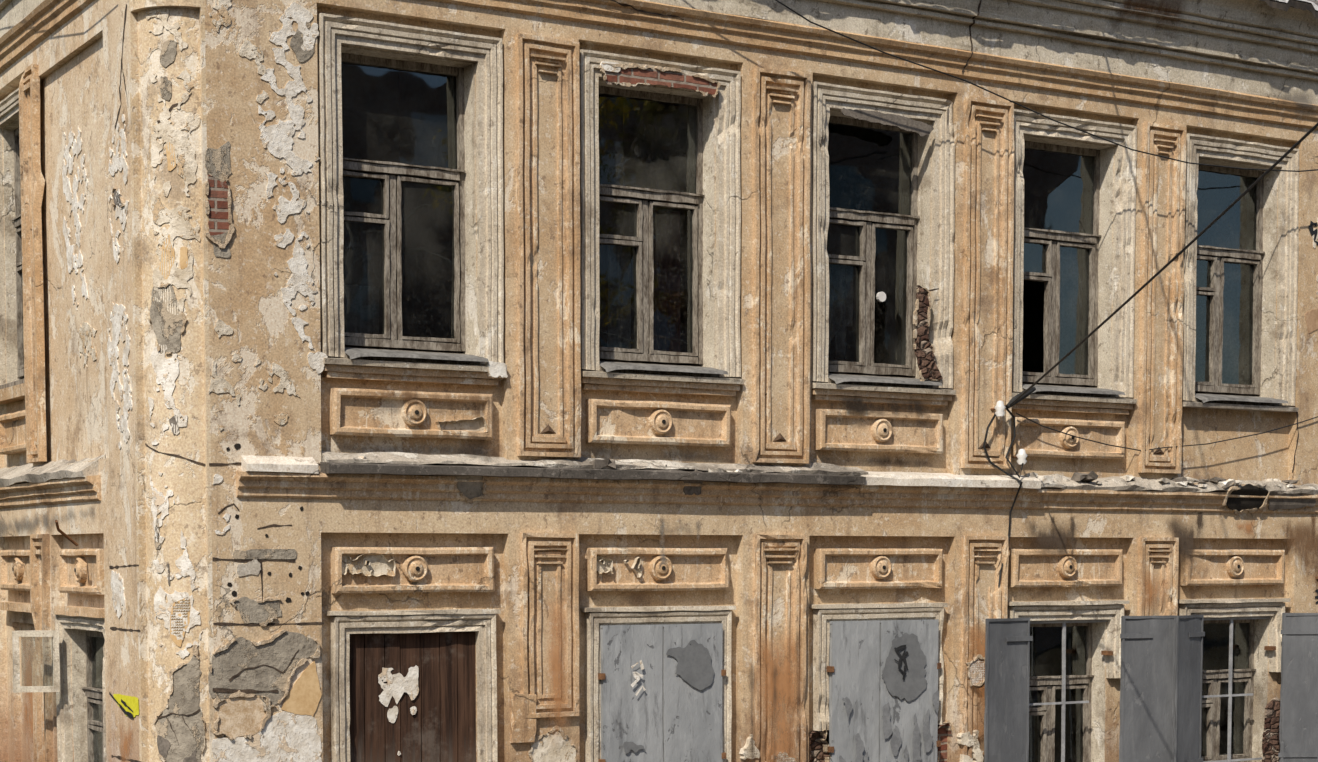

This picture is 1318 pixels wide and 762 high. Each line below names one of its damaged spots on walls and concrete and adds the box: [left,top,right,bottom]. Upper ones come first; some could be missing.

crack [962,0,982,73]
flaking render [599,61,721,98]
peeling [239,2,328,374]
peeling [62,8,235,449]
flaking render [913,285,942,381]
peeling [232,353,299,397]
peeling [338,554,396,577]
peeling [150,471,322,762]
peeling [528,725,577,762]
flaking render [739,697,869,762]
peeling [882,690,984,762]
flaking render [1262,697,1280,762]